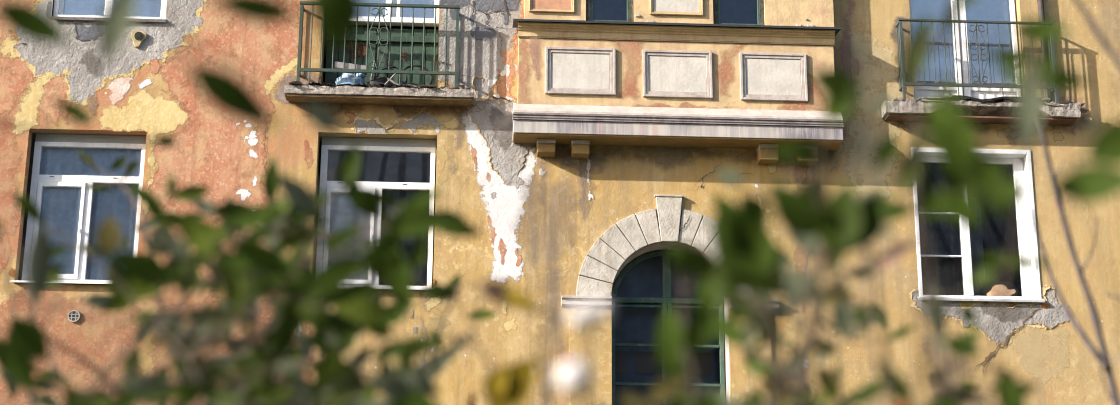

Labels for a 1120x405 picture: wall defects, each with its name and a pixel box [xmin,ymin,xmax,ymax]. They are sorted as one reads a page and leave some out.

peeling [0,0,305,280]
flaking render [350,0,546,282]
crack [679,162,755,232]
flaking render [944,285,1069,346]
crack [975,309,1041,374]